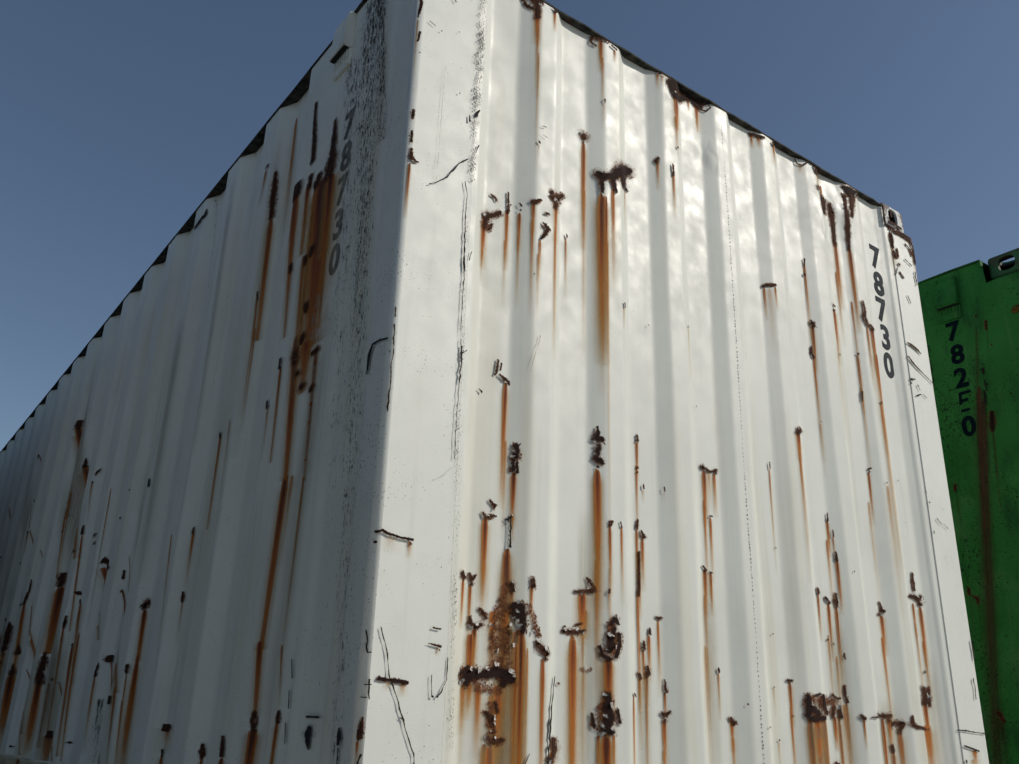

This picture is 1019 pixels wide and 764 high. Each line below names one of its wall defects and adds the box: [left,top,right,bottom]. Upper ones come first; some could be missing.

rust [522,0,558,99]
rust [0,488,111,764]
rust [87,598,151,762]
rust [244,100,340,764]
crack [381,627,415,764]
rust [494,359,522,517]
rust [481,188,568,296]
rust [459,426,663,764]
rust [579,131,636,338]
rust [700,463,718,555]
rust [795,159,899,509]
rust [786,513,934,764]